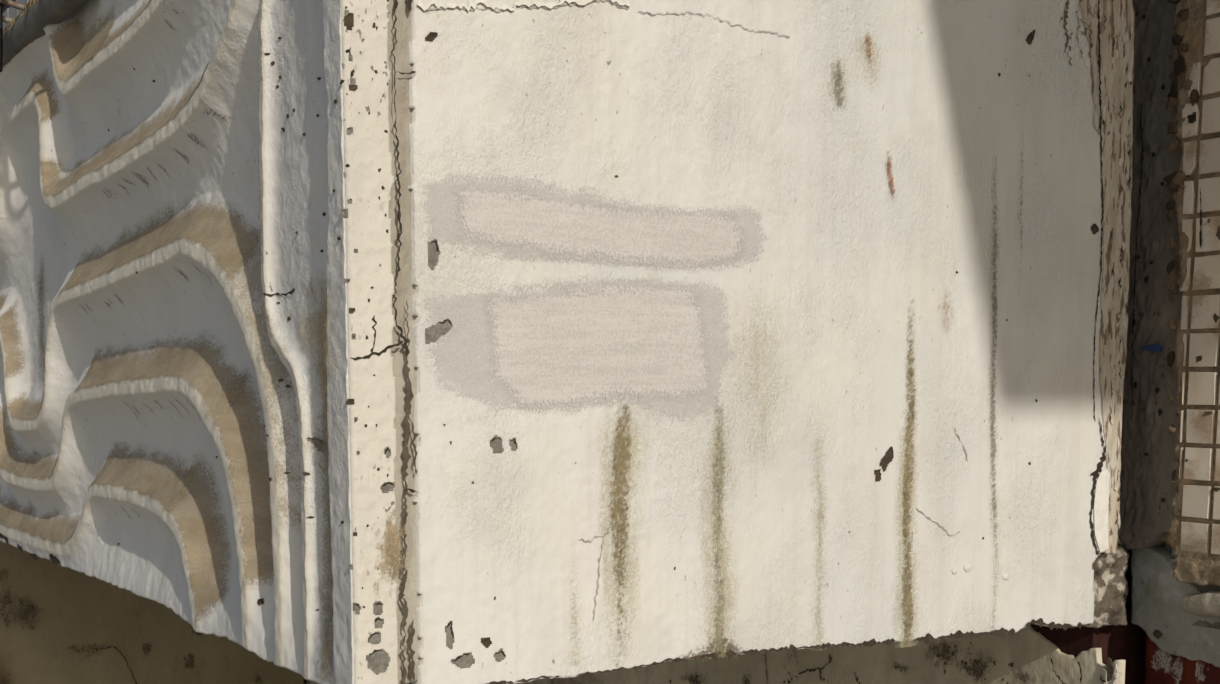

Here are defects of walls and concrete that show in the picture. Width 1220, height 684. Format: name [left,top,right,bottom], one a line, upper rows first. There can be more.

spalling [1152,0,1199,157]
crack [263,0,790,684]
peeling [1068,0,1153,629]
spalling [445,621,506,668]
damp [611,405,632,643]
damp [713,409,725,657]
damp [902,314,916,647]
damp [933,642,1029,682]